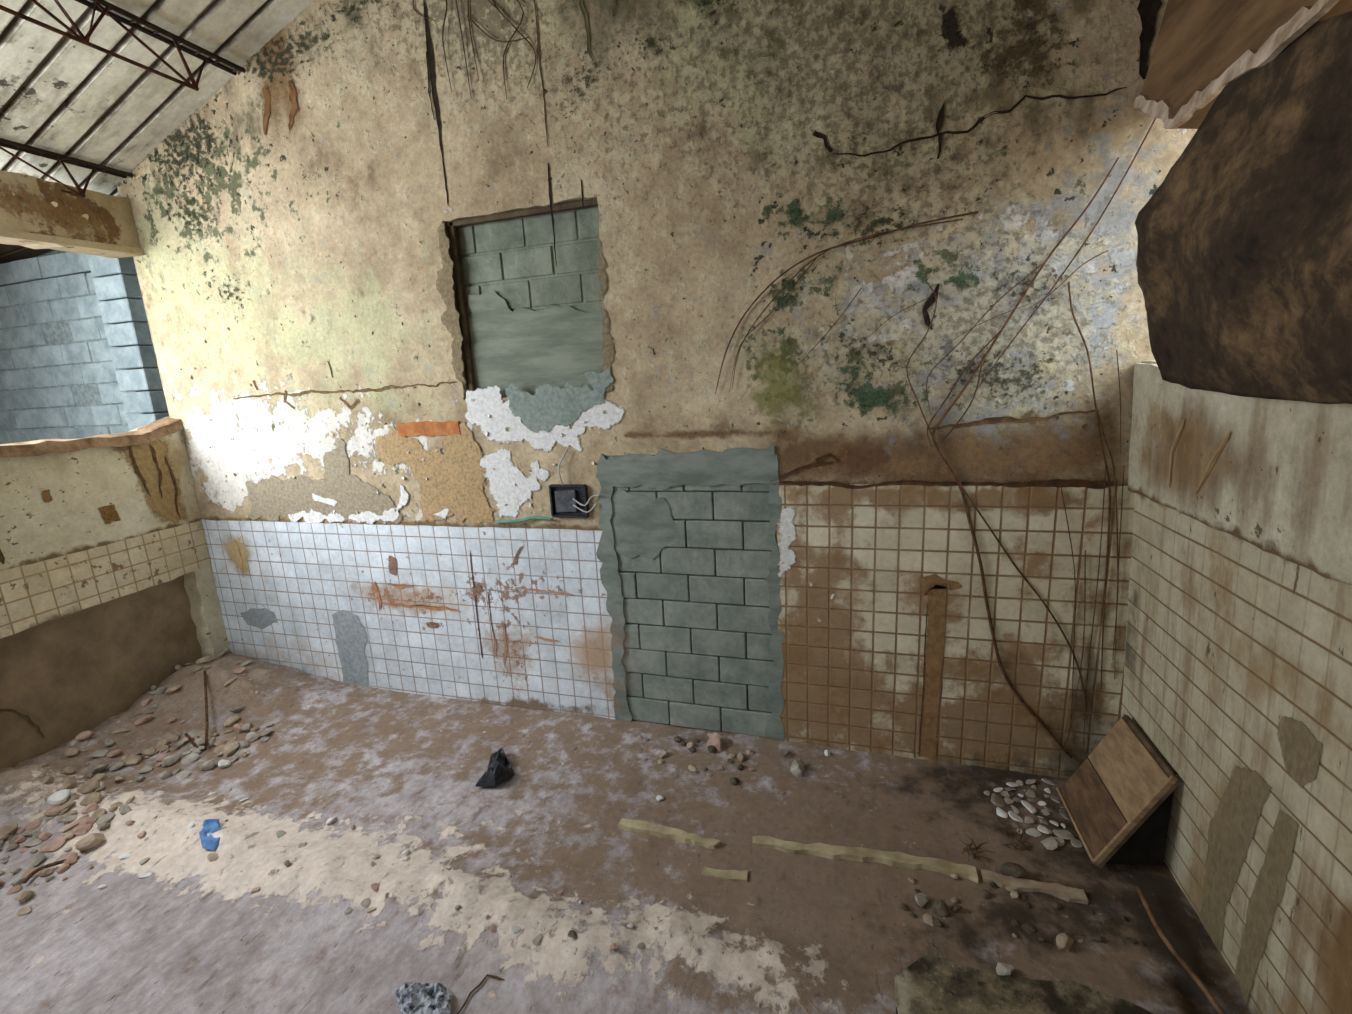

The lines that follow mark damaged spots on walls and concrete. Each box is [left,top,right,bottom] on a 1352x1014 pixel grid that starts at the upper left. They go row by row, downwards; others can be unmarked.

water stain [562,0,676,113]
crack [813,0,1162,159]
water stain [114,104,235,243]
peeling [245,222,625,525]
corrosion [374,582,461,612]
corrosion [493,620,507,666]
corrosion [507,587,573,595]